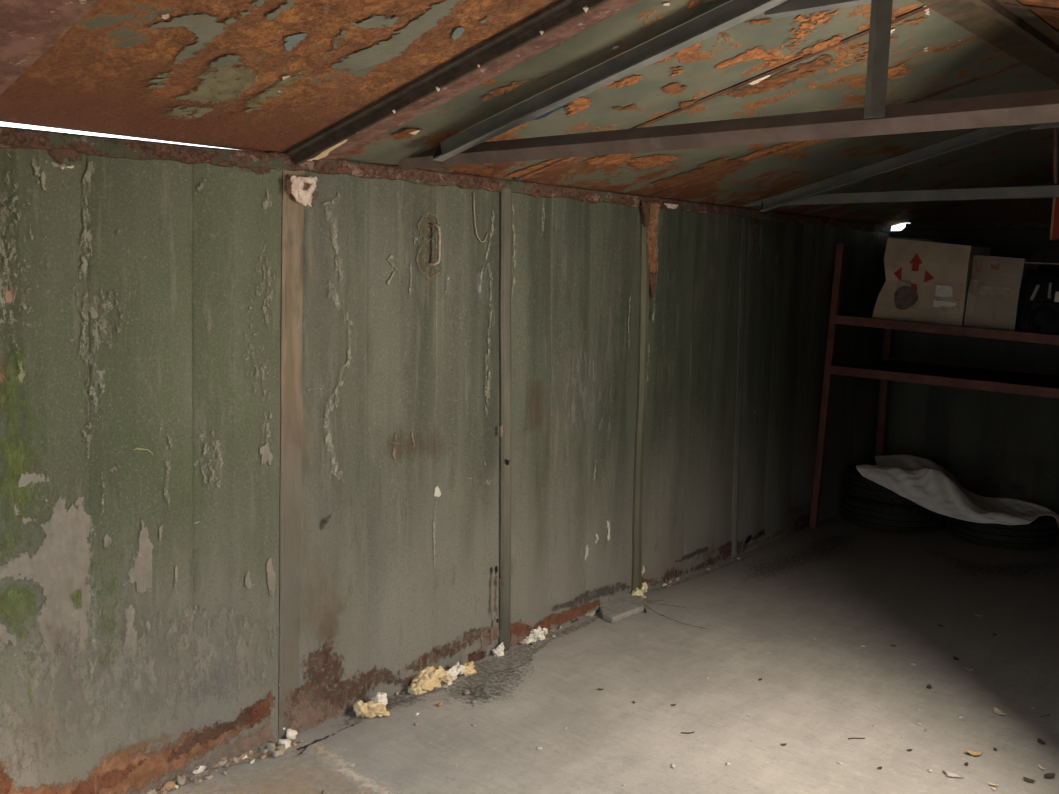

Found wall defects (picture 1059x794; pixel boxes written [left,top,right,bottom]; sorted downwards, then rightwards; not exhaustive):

peeling [147,0,295,89]
peeling [166,53,308,120]
peeling [328,0,466,71]
rust [715,9,847,99]
rust [890,6,930,47]
water stain [32,160,71,201]
water stain [79,160,96,276]
peeling [306,140,347,161]
rust [438,138,836,298]
efflorescence [308,224,354,482]
peeling [0,464,121,666]
rust [0,540,746,794]